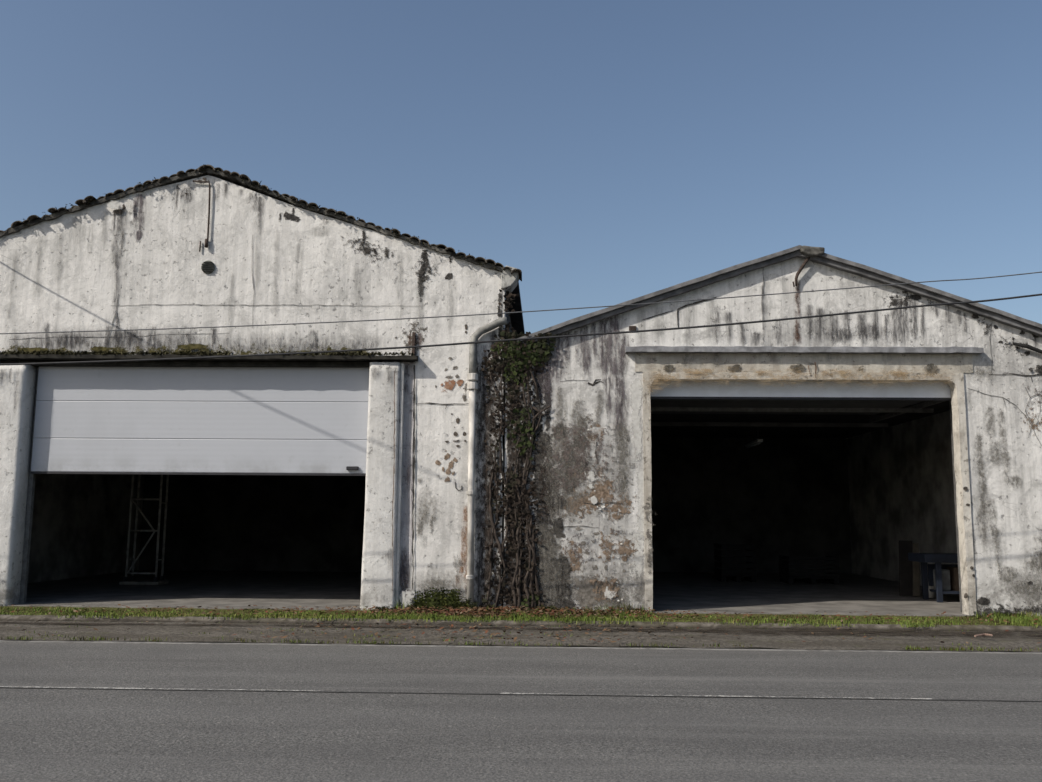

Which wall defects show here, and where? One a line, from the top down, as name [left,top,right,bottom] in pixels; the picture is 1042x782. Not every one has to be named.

leakage [113,194,144,299]
leakage [415,248,453,302]
leakage [14,322,373,352]
leakage [715,312,760,345]
leakage [808,291,998,342]
flaking render [435,357,467,402]
crack [968,323,1042,446]
peeling [435,413,466,482]
leakage [474,292,653,611]
peeling [545,378,645,609]
leakage [382,549,407,597]